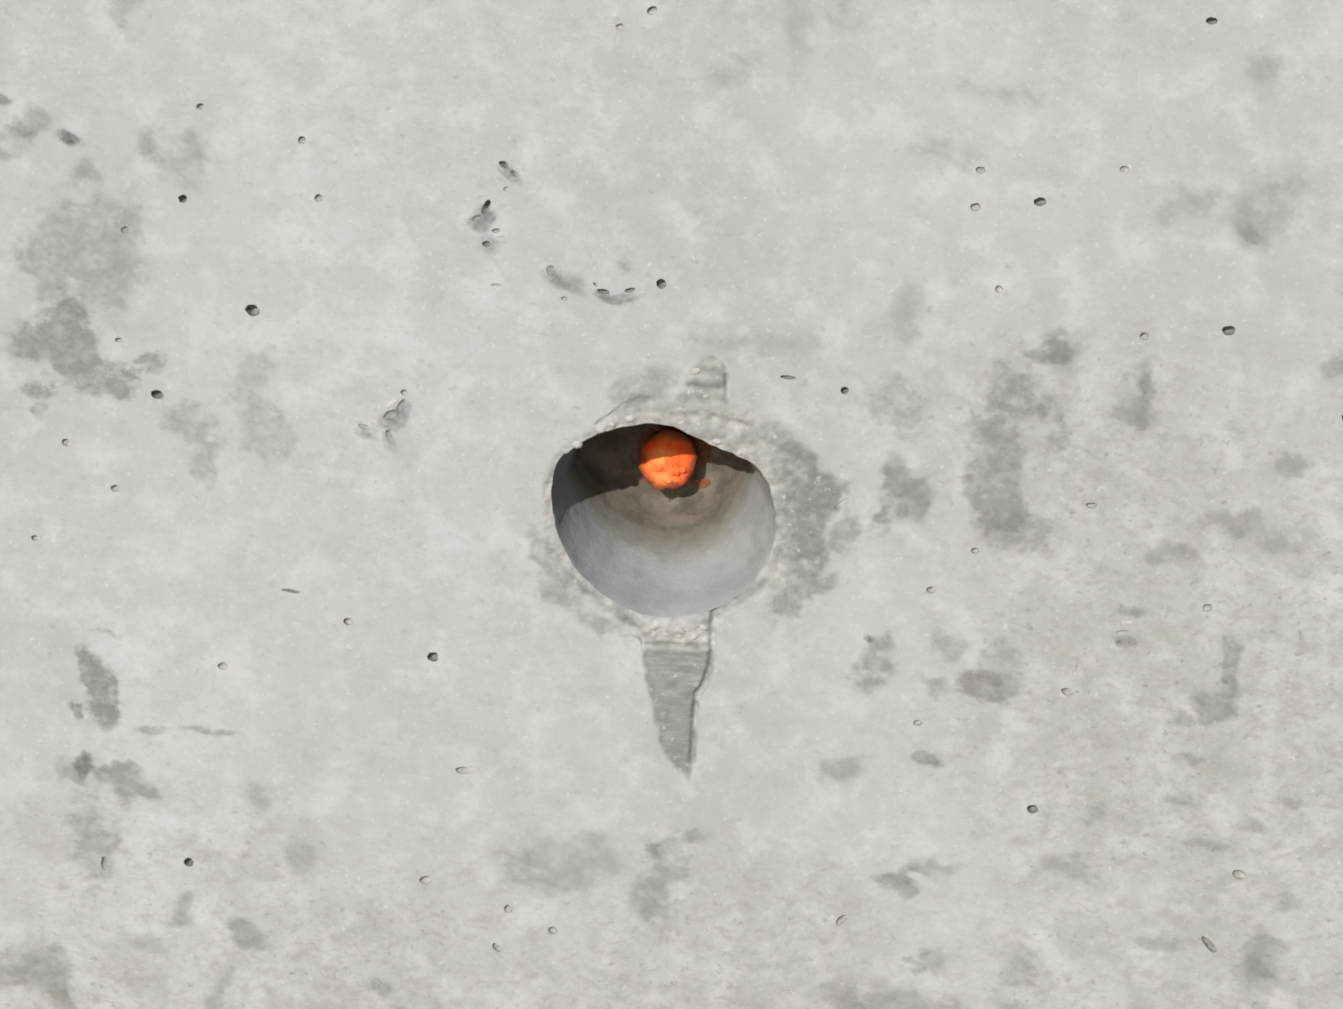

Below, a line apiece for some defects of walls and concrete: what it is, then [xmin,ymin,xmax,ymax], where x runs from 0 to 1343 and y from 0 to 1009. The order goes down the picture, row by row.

corrosion [642,435,710,487]
spalling [539,354,853,646]